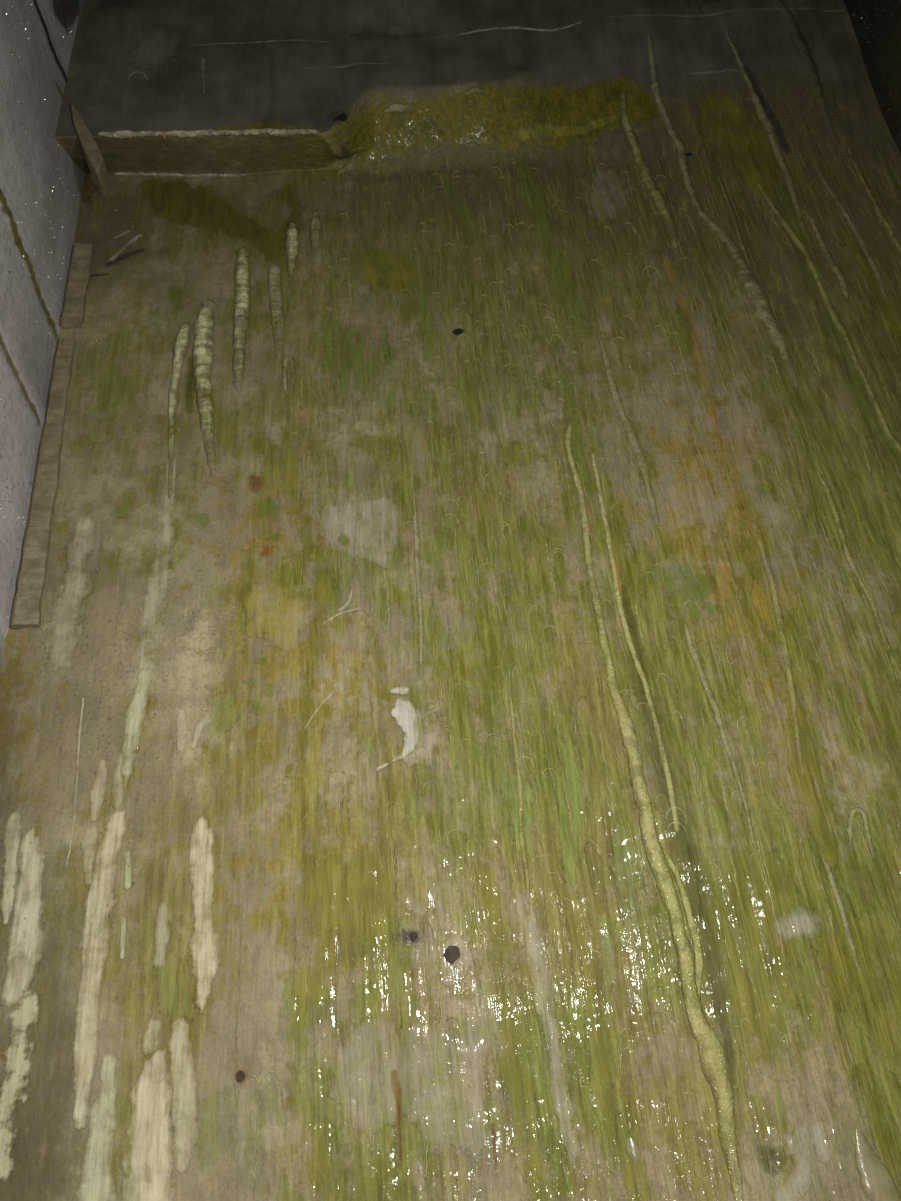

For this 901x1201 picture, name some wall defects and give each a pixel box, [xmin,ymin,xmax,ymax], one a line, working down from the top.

crack [34,0,67,83]
crack [189,7,845,69]
damp [182,355,197,414]
damp [40,515,98,673]
damp [66,457,222,1201]
damp [0,811,48,1183]